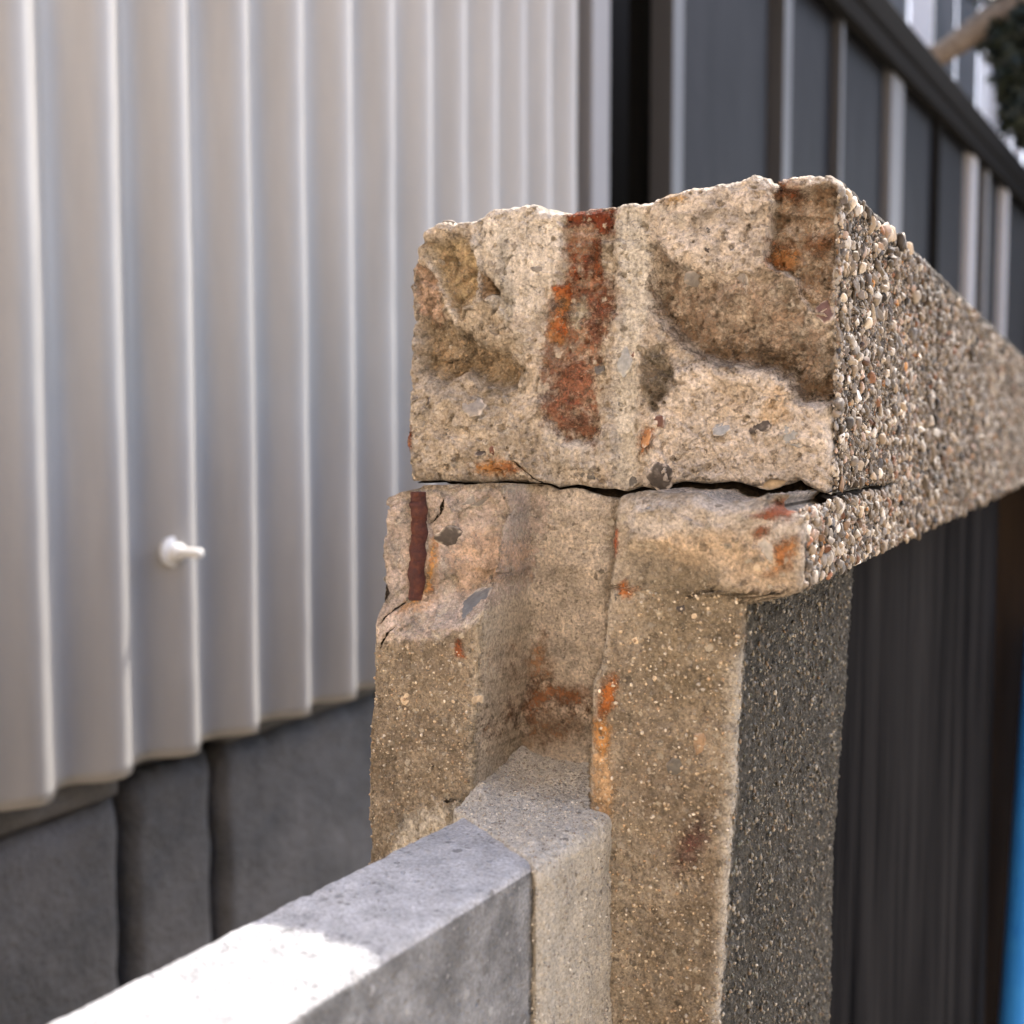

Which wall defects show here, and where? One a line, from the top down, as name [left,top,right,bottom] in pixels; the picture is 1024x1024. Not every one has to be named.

rust [778,179,800,201]
rust [768,236,834,271]
spalling [415,251,524,383]
rust [540,208,615,447]
spalling [649,184,838,401]
spalling [639,351,675,404]
crack [418,461,887,523]
rust [753,499,796,538]
rust [401,538,438,611]
rust [768,536,798,577]
rust [507,644,616,815]